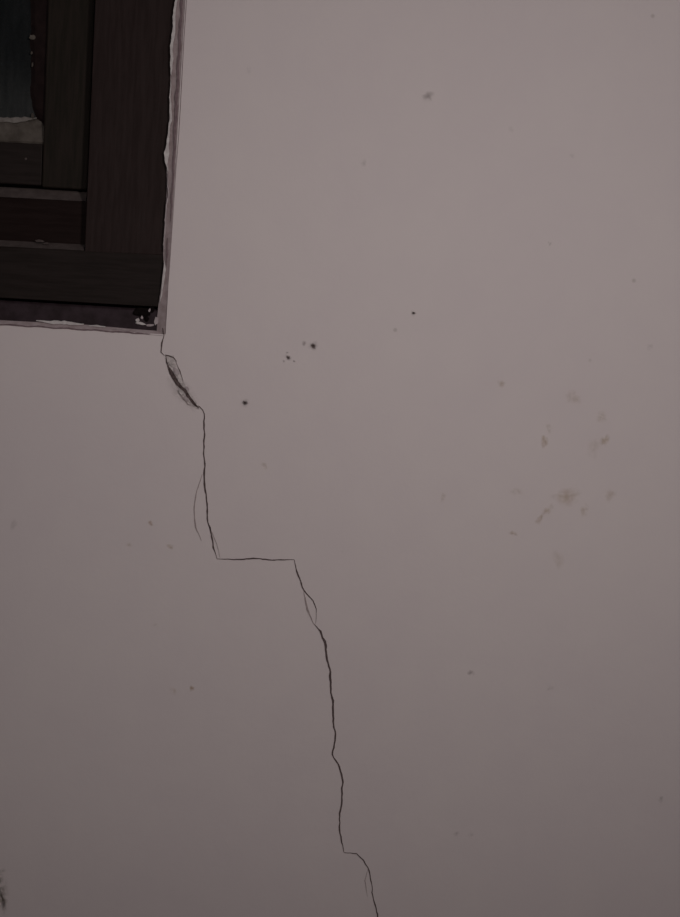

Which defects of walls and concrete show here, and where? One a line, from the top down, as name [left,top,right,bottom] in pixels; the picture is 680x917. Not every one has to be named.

crack [194,406,378,917]